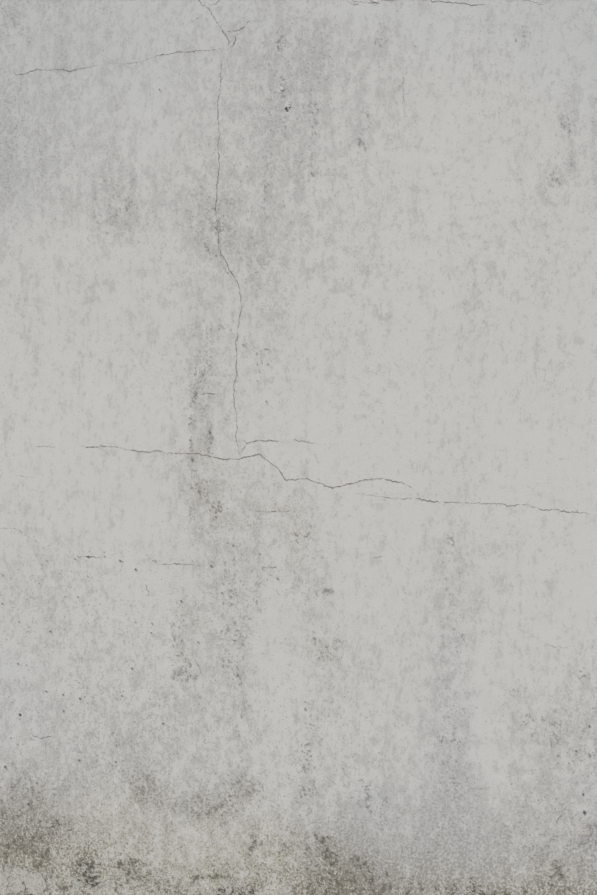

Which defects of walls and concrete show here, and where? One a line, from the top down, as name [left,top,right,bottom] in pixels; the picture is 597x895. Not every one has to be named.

crack [86,0,583,513]
mould [190,867,255,895]